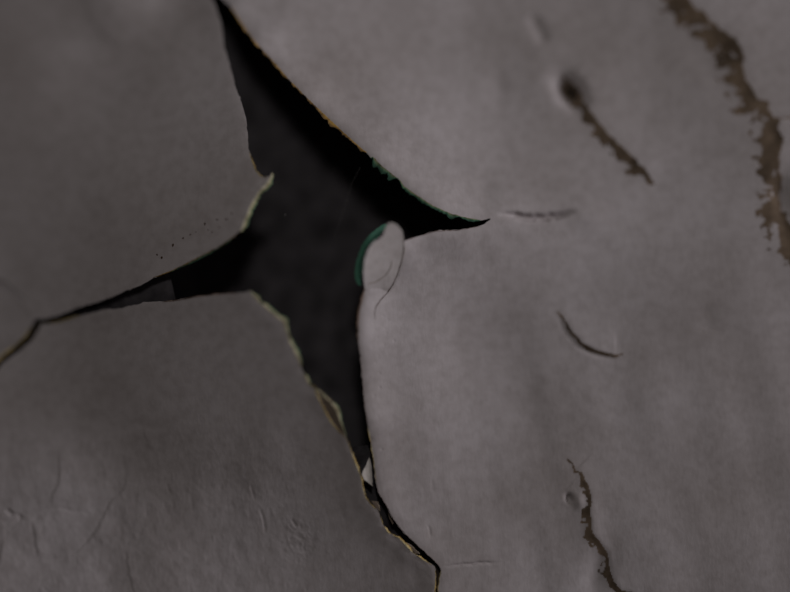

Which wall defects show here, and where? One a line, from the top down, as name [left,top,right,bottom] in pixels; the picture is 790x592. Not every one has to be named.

crack [0,272,176,380]
peeling [38,0,603,592]
crack [537,289,646,373]